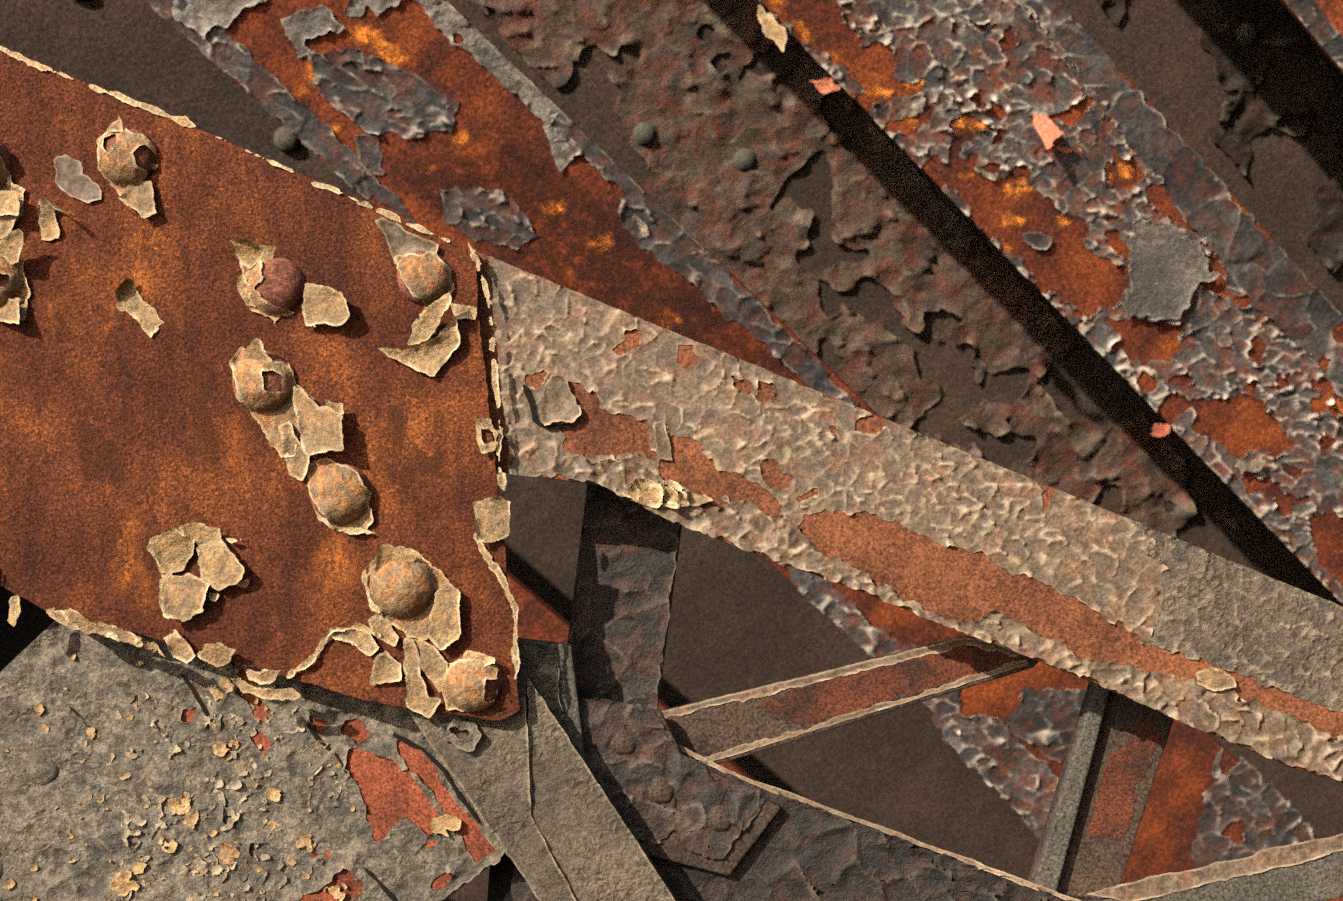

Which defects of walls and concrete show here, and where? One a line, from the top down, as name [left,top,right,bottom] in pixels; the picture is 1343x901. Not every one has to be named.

peeling [0,46,196,324]
peeling [115,278,165,337]
peeling [144,0,477,377]
corrosion [355,27,403,64]
corrosion [404,132,797,379]
corrosion [863,78,925,97]
corrosion [1005,179,1033,196]
peeling [229,339,375,535]
peeling [0,496,675,901]